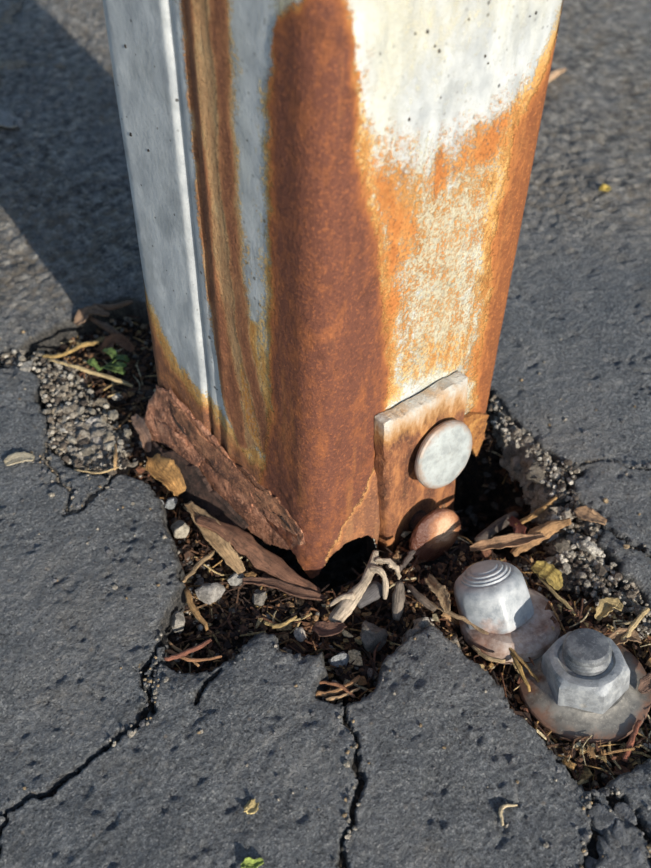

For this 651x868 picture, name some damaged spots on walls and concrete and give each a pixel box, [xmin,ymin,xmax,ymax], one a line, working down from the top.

rust [142,0,563,579]
crack [195,672,218,702]
crack [0,638,167,854]
crack [343,711,365,826]
crack [338,852,347,868]
crack [583,794,651,868]